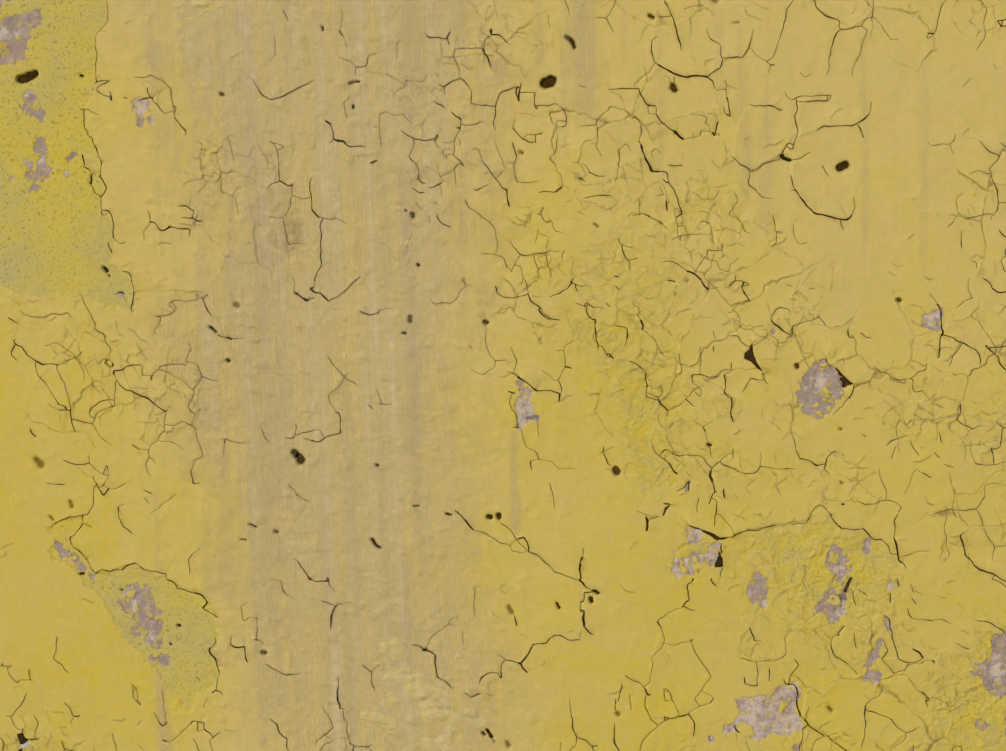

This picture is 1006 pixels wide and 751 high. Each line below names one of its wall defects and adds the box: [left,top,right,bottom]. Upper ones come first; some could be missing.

peeling [0,0,136,313]
crack [80,1,243,340]
crack [325,0,894,533]
peeling [47,516,221,711]
crack [8,295,392,751]
crack [413,510,595,698]
crack [560,567,724,751]
spalling [723,681,803,751]
peeling [671,514,904,685]
spalling [792,358,854,419]
crack [740,141,1006,751]
peeling [933,631,1006,751]